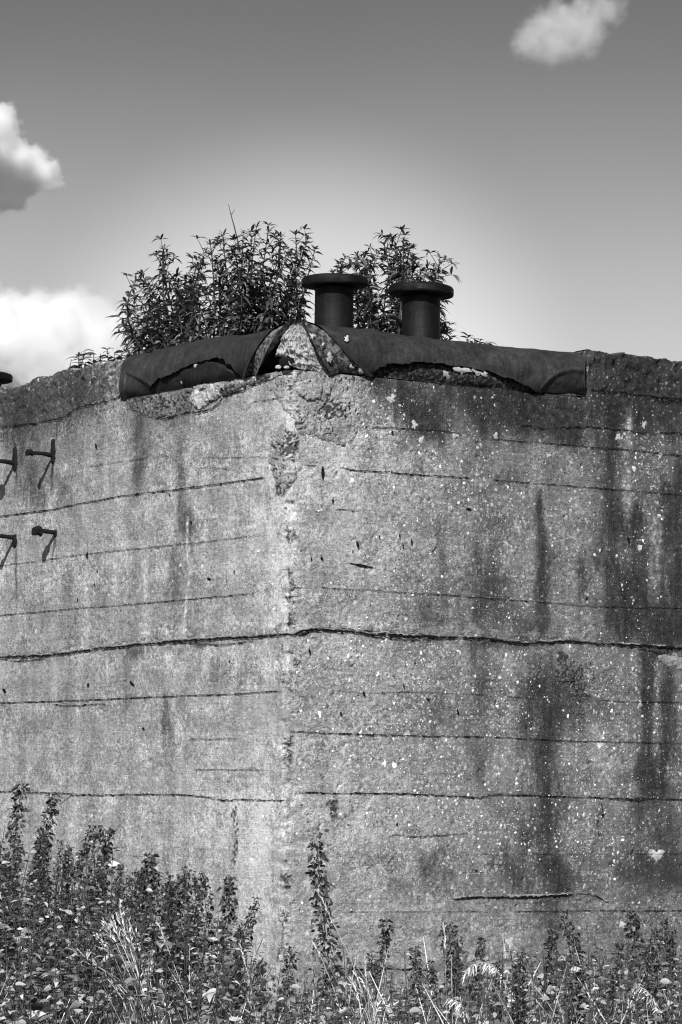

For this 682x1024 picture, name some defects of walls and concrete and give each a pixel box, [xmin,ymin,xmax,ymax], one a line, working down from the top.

spalling [126,324,365,787]
crack [0,627,682,662]
leakage [369,352,682,888]
leakage [507,661,584,930]